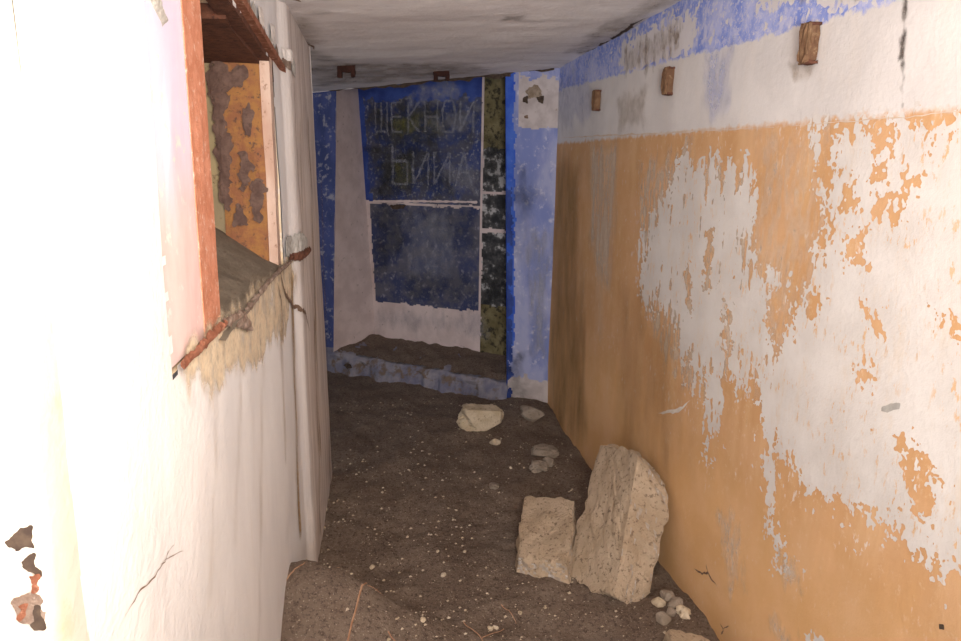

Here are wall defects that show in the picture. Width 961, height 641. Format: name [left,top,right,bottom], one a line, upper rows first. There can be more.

peeling [611,0,703,73]
peeling [755,0,886,31]
spalling [523,84,544,119]
spalling [180,231,310,391]
peeling [636,101,961,585]
spalling [5,525,47,631]
crack [126,545,181,614]